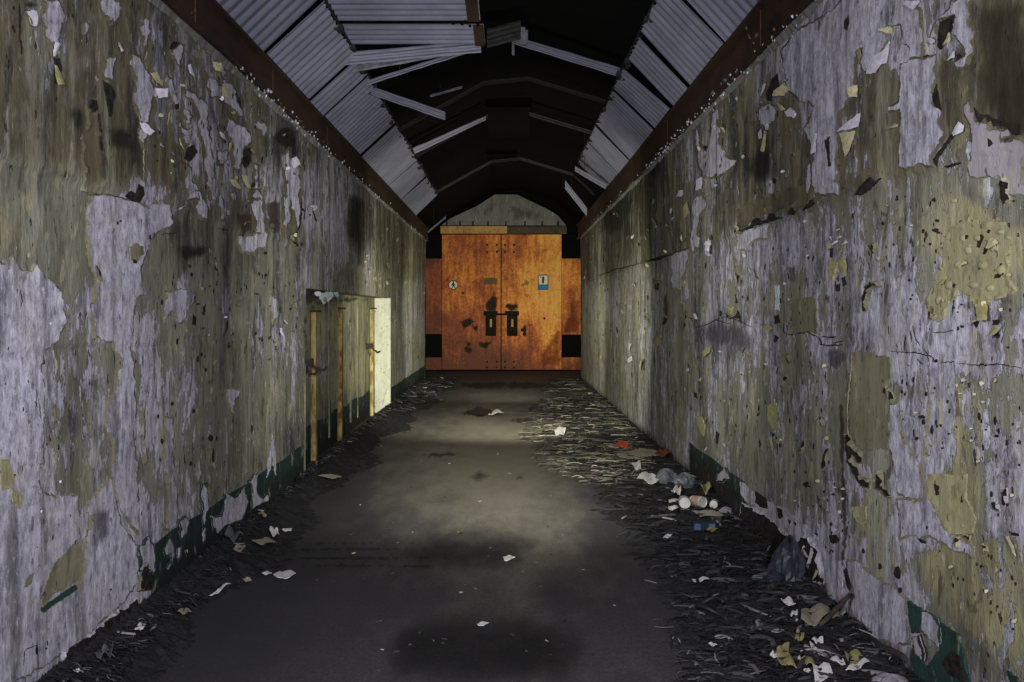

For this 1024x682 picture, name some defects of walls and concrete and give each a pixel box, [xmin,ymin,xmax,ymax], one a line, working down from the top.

peeling [24,0,65,85]
peeling [98,0,121,26]
peeling [315,226,399,304]
peeling [0,18,317,682]